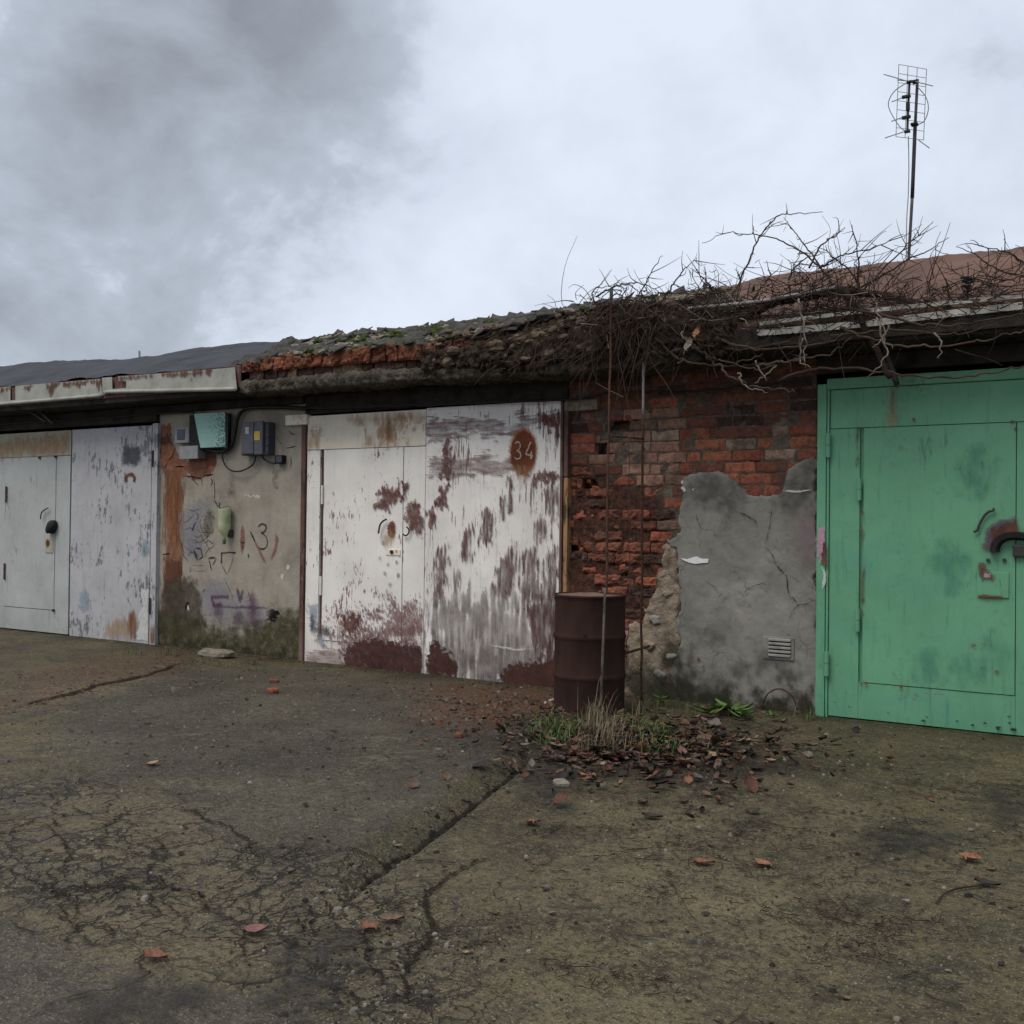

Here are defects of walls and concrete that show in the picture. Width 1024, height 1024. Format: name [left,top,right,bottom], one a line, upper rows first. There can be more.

corrosion [46,379,102,396]
corrosion [116,368,212,380]
corrosion [509,428,537,481]
corrosion [162,470,184,594]
corrosion [384,521,396,543]
corrosion [983,516,1018,550]
crack [707,506,815,614]
water stain [158,578,299,660]